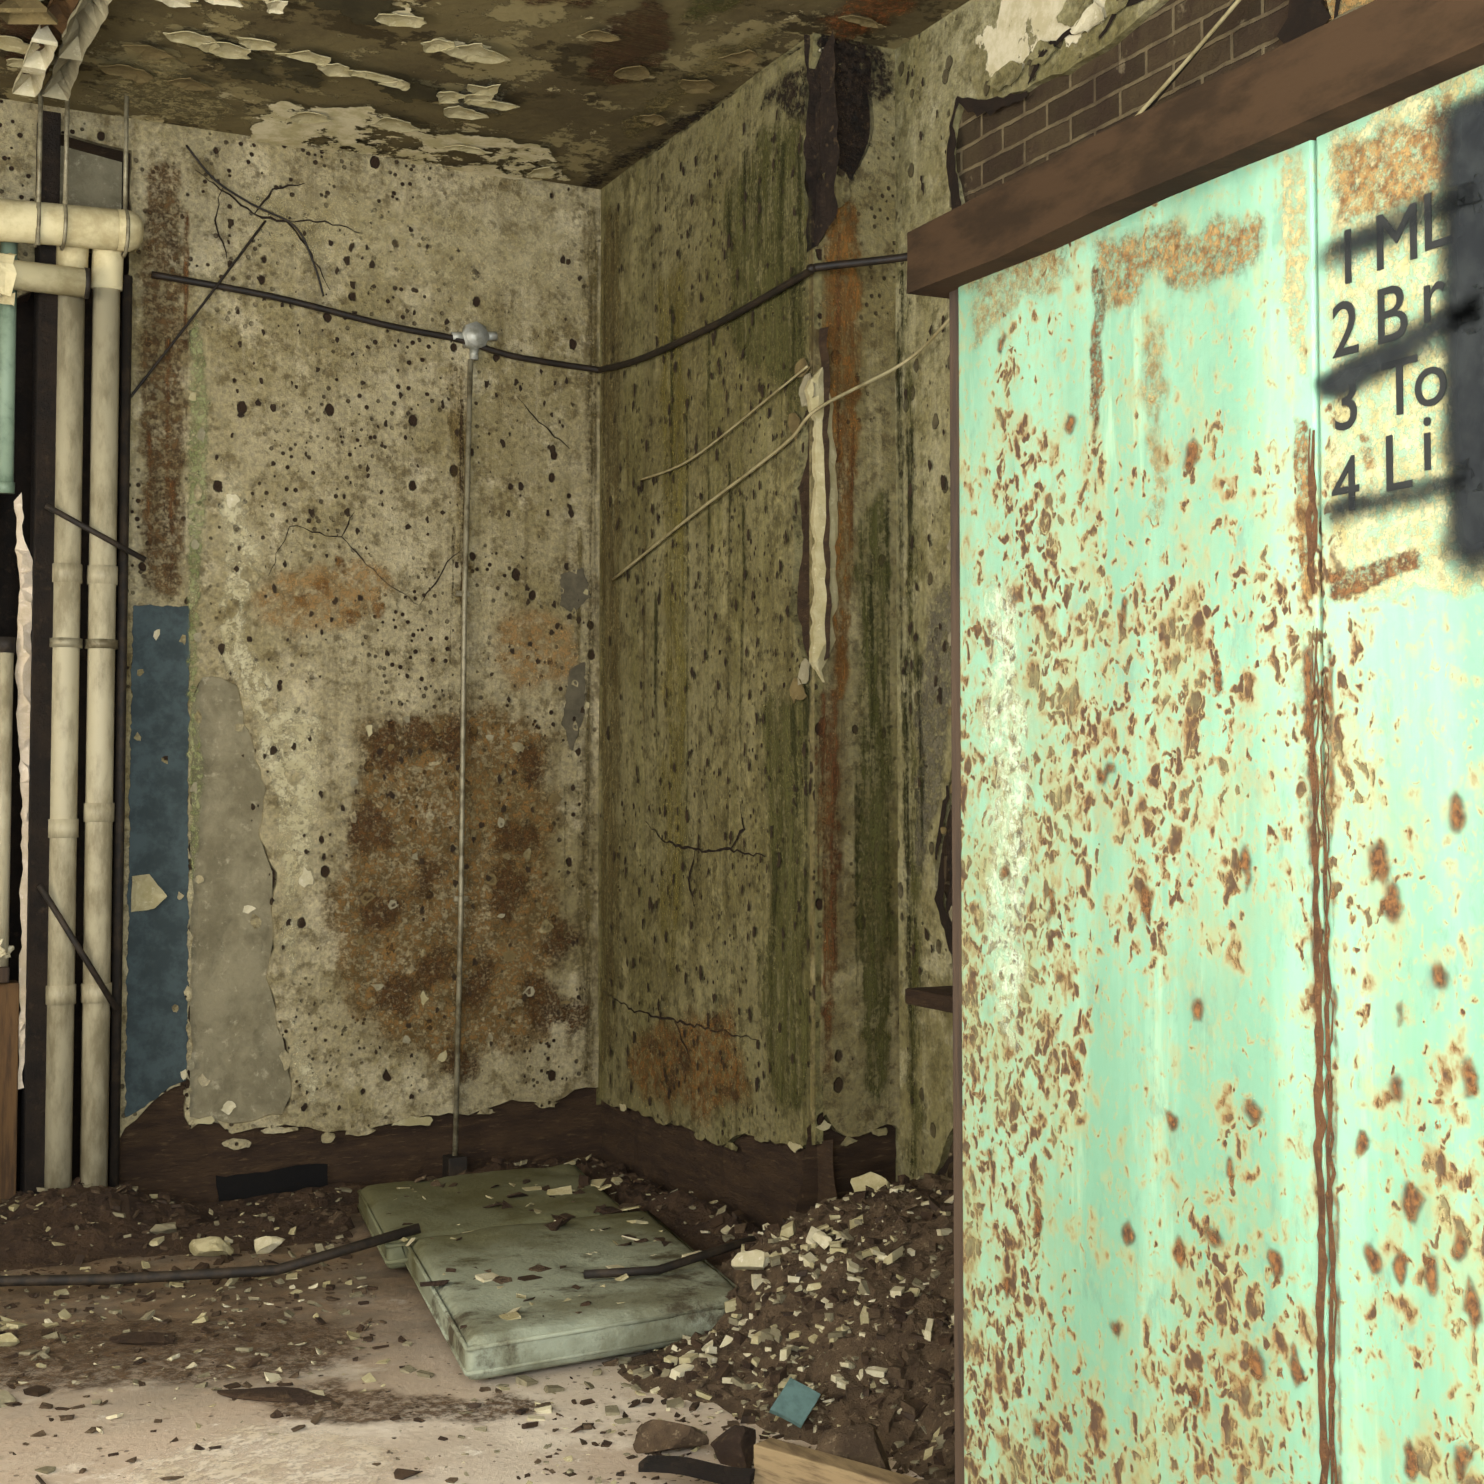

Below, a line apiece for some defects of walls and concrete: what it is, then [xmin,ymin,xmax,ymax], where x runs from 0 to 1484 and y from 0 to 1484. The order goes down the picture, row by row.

peeling [0,0,570,181]
peeling [581,29,620,42]
damp [584,92,734,188]
damp [447,369,471,607]
spalling [108,320,896,1232]
damp [497,209,628,1076]
damp [643,276,689,965]
spalling [589,28,924,1009]
damp [757,687,809,995]
rust [815,201,862,1073]
flaking render [902,580,952,930]
spalling [908,458,951,565]